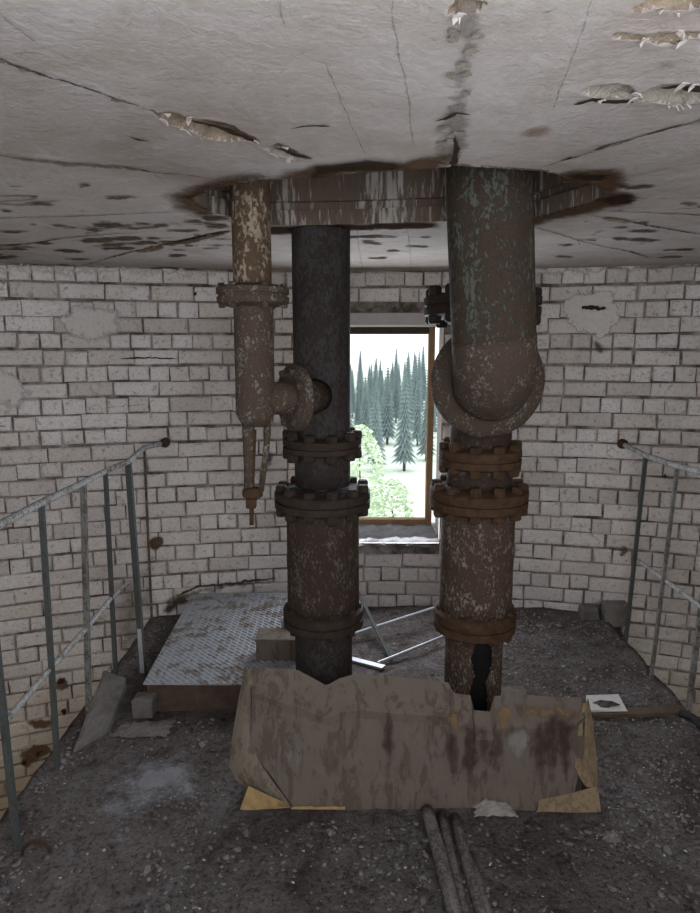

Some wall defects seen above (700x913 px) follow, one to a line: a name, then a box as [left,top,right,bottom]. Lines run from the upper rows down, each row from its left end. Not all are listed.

spalling [426,0,512,43]
spalling [592,0,700,52]
crack [0,52,162,117]
spalling [566,77,700,111]
spalling [144,108,320,164]
crack [550,120,700,165]